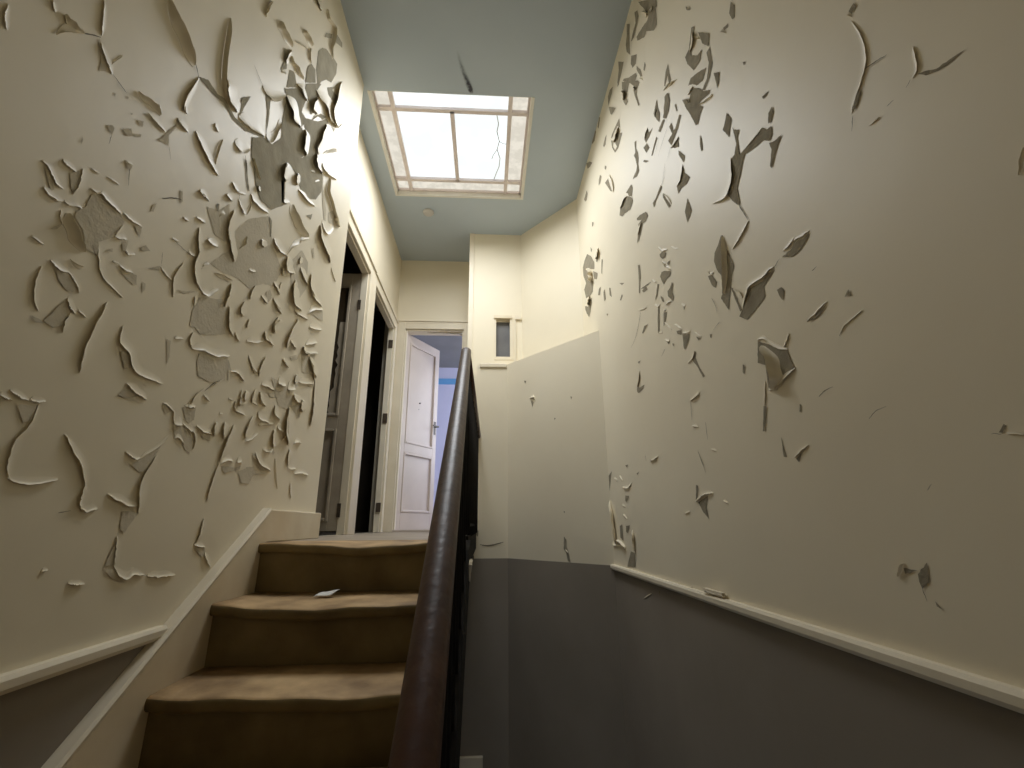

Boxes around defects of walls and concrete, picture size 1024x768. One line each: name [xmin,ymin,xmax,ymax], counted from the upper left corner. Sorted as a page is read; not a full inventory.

peeling [847,3,886,125]
peeling [906,47,964,87]
peeling [592,0,735,243]
peeling [32,0,346,582]
peeling [583,248,624,316]
peeling [633,92,809,377]
peeling [757,333,795,431]
peeling [0,388,58,485]
peeling [608,465,639,567]
peeling [685,485,713,518]
peeling [897,563,941,608]